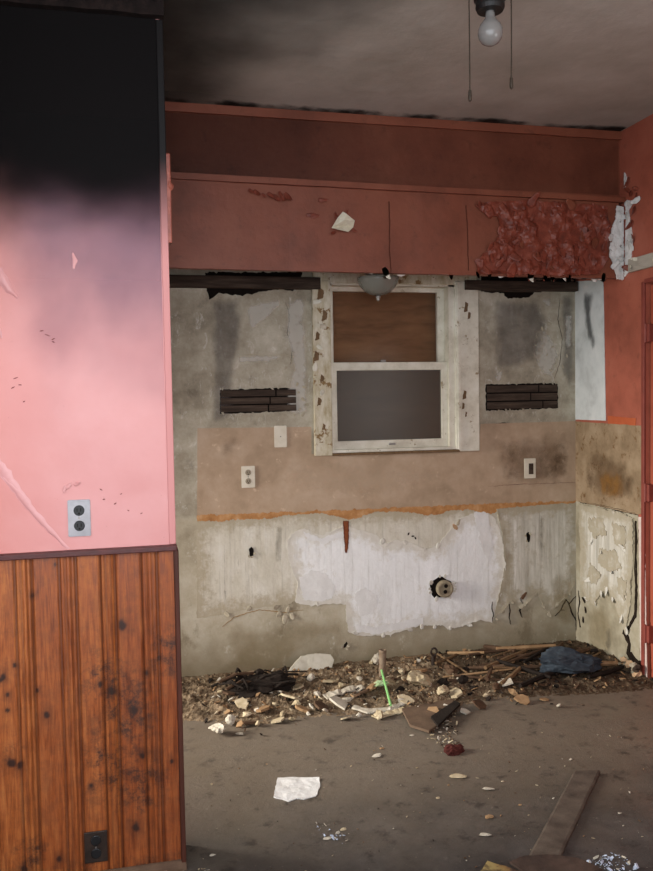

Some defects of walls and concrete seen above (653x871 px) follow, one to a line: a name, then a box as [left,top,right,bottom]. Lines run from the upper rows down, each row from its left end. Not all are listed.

flaking render [528,177,640,283]
crack [0,453,69,550]
peeling [196,501,642,677]
crack [580,502,641,666]